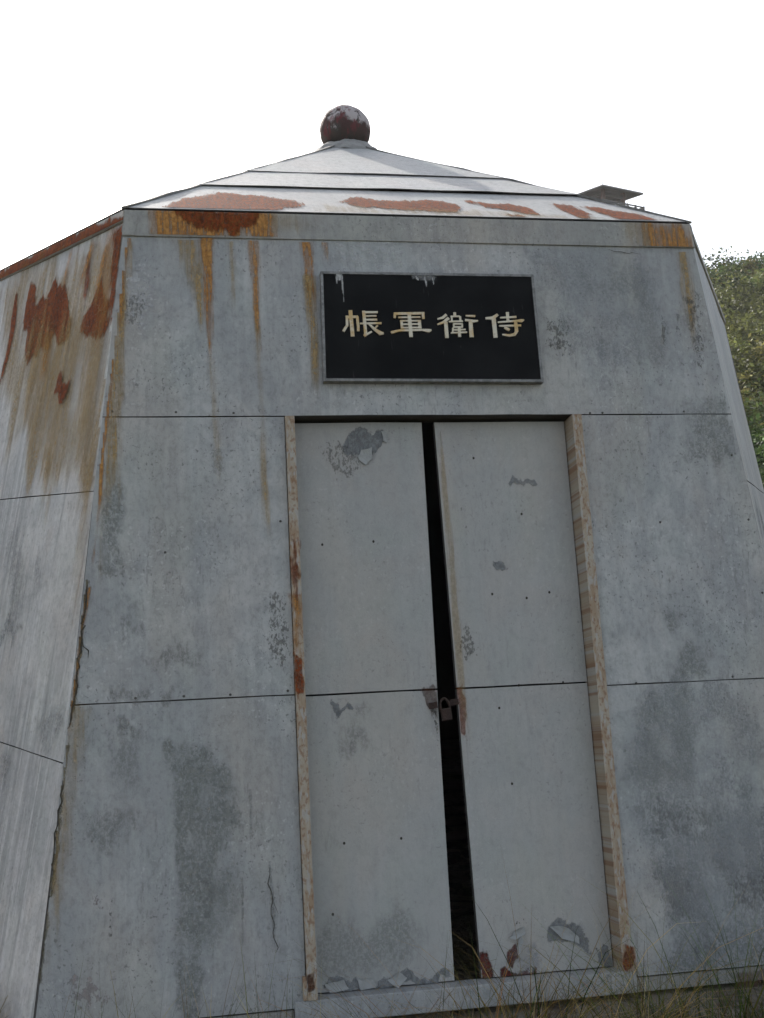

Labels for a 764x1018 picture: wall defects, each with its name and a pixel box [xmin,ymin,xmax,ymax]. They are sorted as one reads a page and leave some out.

rust [340,197,539,217]
rust [148,192,304,331]
rust [554,203,705,366]
rust [0,216,131,504]
peeling [343,427,388,465]
rust [290,542,301,626]
rust [294,638,304,694]
damp [173,751,236,1018]
peeling [324,968,450,993]
peeling [548,918,612,967]